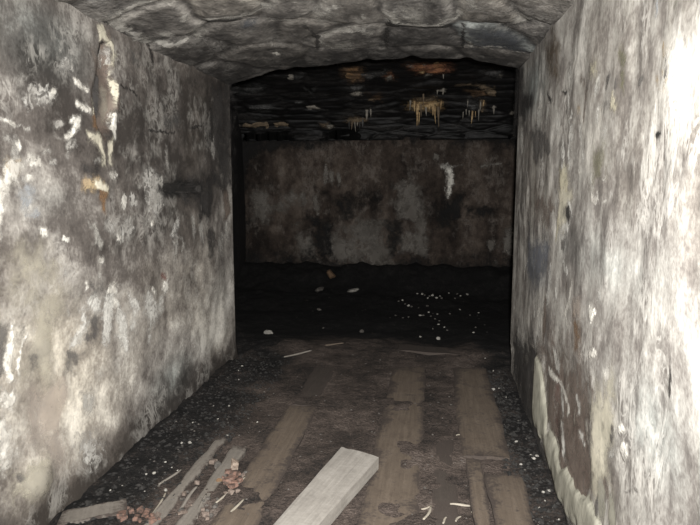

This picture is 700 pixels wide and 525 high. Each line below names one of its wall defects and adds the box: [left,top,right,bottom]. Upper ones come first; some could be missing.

rust [407,61,451,76]
damp [24,84,56,109]
spalling [55,24,119,165]
damp [347,98,373,132]
damp [407,88,445,127]
damp [455,84,496,123]
rust [82,164,109,212]
damp [433,153,497,228]
peeling [514,329,602,525]